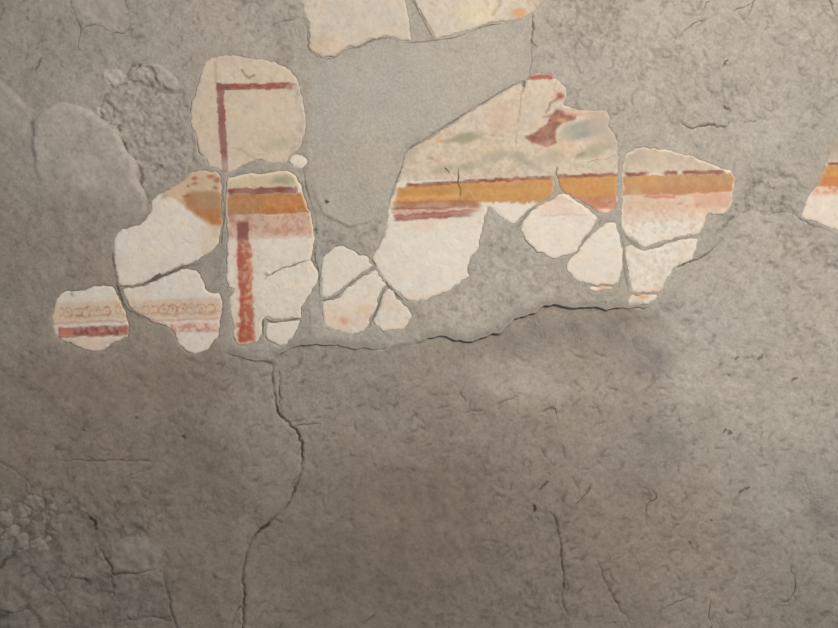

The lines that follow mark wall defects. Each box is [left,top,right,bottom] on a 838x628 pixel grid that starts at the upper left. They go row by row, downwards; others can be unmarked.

spalling [96,64,191,187]
crack [276,389,315,462]